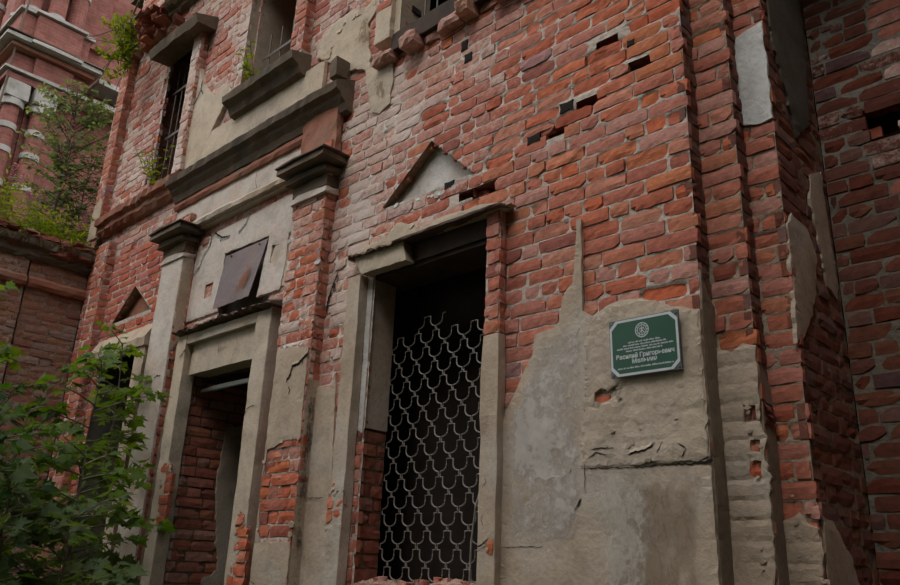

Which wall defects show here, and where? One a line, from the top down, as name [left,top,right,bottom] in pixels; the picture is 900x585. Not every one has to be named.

hole [595,33,635,55]
hole [620,56,651,77]
hole [559,93,599,115]
crack [286,350,308,392]
flaking render [594,383,622,405]
flaking render [226,434,307,585]